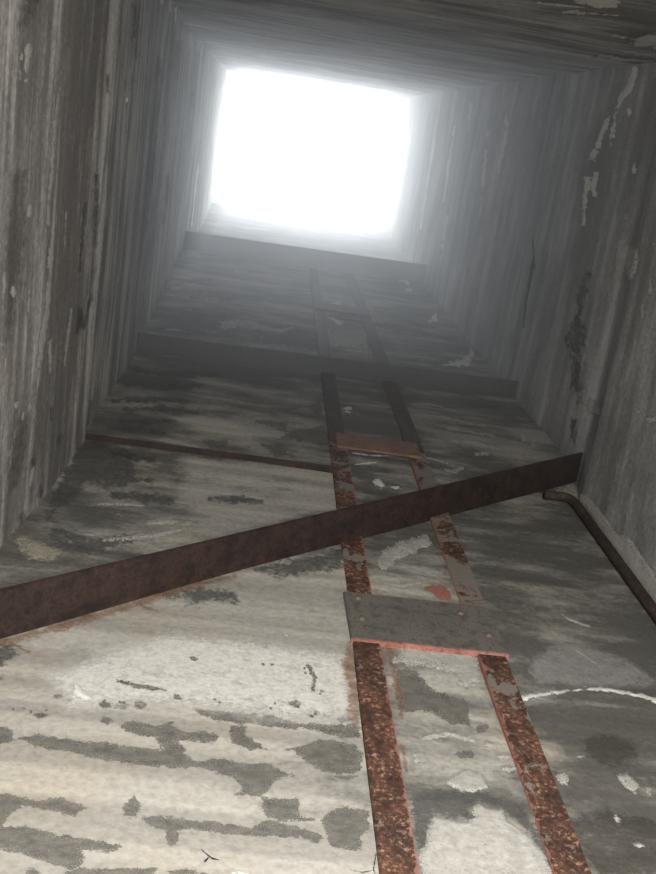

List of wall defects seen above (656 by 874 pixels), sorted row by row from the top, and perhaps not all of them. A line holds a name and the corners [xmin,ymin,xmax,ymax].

peeling [536,0,623,17]
water stain [46,441,174,554]
water stain [208,495,263,505]
water stain [0,644,15,666]
water stain [50,635,355,719]
water stain [521,686,656,703]
water stain [569,811,656,874]